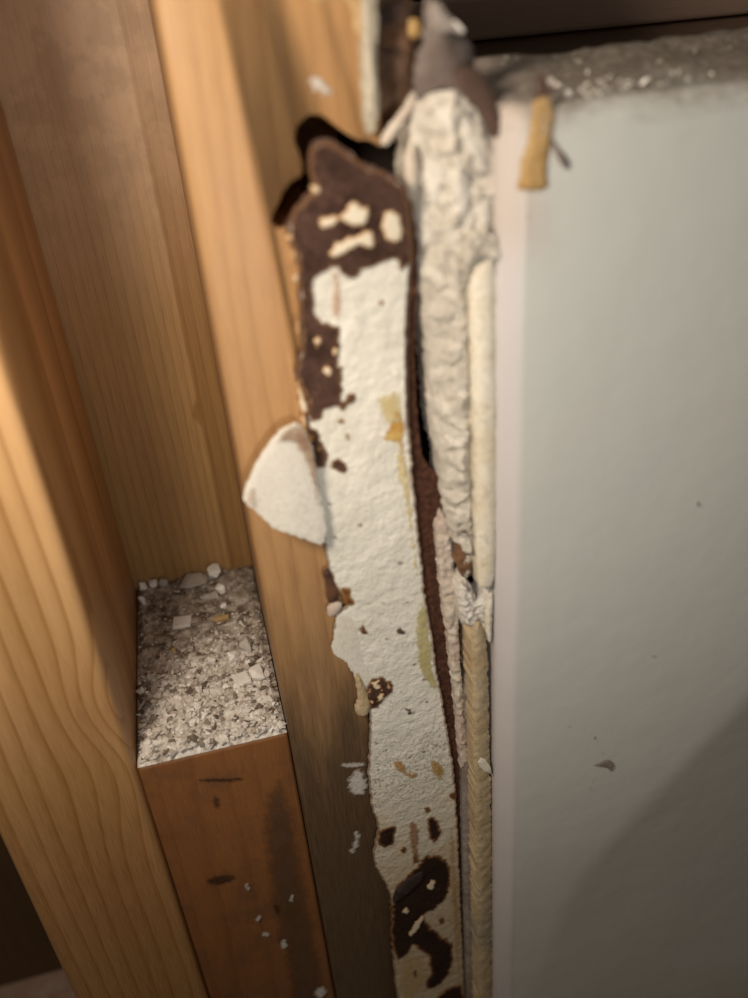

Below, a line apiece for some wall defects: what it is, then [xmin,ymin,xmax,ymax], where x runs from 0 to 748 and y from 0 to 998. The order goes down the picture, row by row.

flaking render [394,87,501,577]
flaking render [243,422,336,545]
peeling [323,568,372,686]